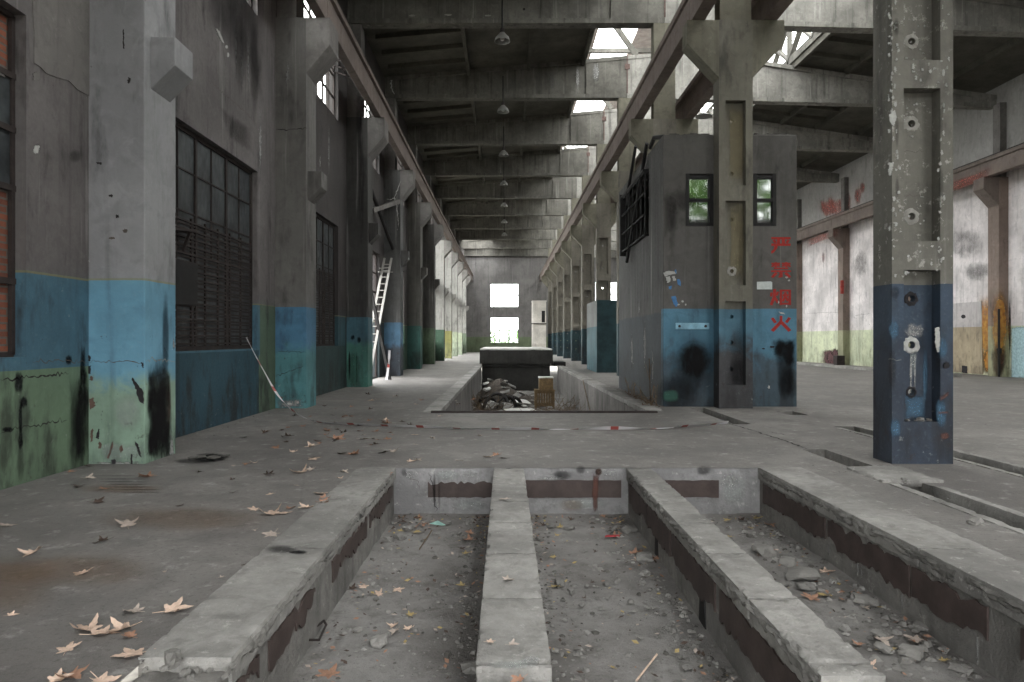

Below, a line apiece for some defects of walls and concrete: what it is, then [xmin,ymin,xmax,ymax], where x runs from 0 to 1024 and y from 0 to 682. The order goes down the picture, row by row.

peeling [887,0,950,176]
spalling [888,191,925,260]
damp [73,350,89,456]
damp [148,315,175,455]
rust [982,298,1011,377]
spalling [216,468,819,682]
spalling [651,468,1024,614]